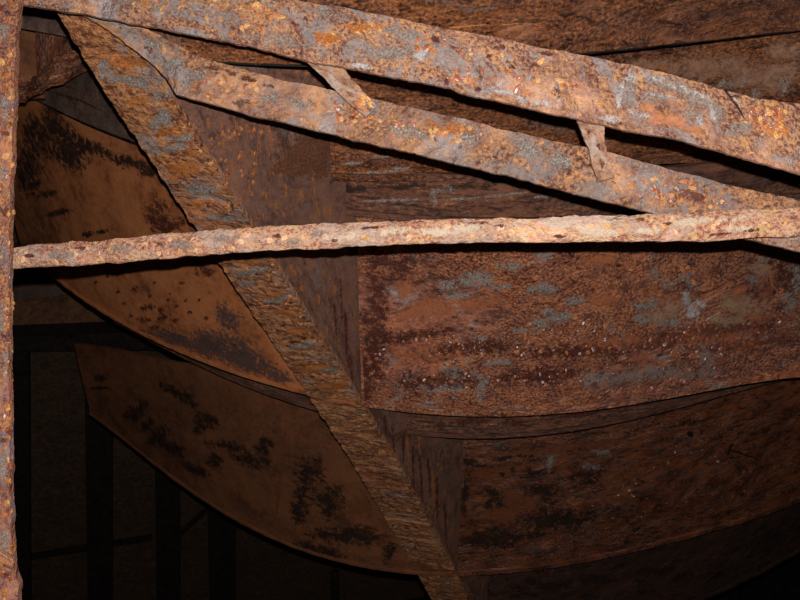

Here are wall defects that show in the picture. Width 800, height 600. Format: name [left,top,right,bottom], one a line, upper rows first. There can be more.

rust [210,0,286,38]
rust [313,22,382,47]
rust [488,43,580,99]
rust [627,42,800,95]
rust [314,94,492,148]
rust [163,118,332,217]
damp [142,194,186,234]
rust [222,232,288,251]
damp [148,302,293,385]
rust [371,258,800,405]
rust [1,342,14,484]
damp [122,381,274,478]